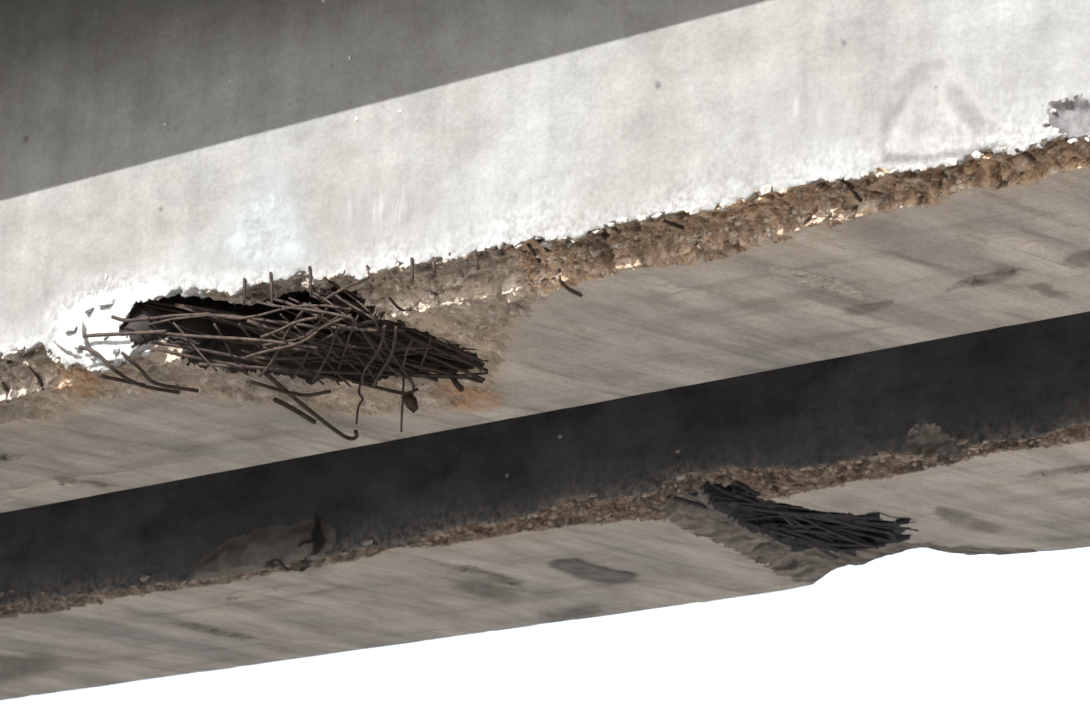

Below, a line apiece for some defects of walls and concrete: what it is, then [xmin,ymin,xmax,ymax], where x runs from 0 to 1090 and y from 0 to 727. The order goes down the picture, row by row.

spalling [0,94,1090,441]
spalling [0,422,1090,619]